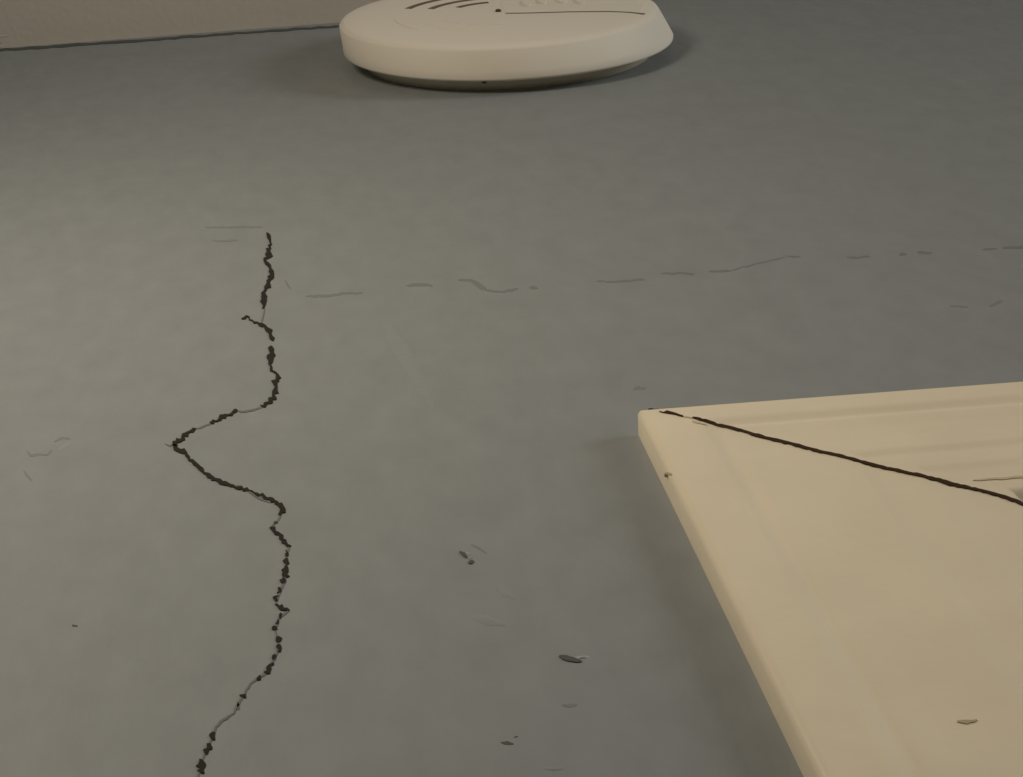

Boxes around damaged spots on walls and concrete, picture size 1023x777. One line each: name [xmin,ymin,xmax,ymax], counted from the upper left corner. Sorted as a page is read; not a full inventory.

crack [597,255,800,283]
crack [458,279,538,293]
crack [165,225,363,777]